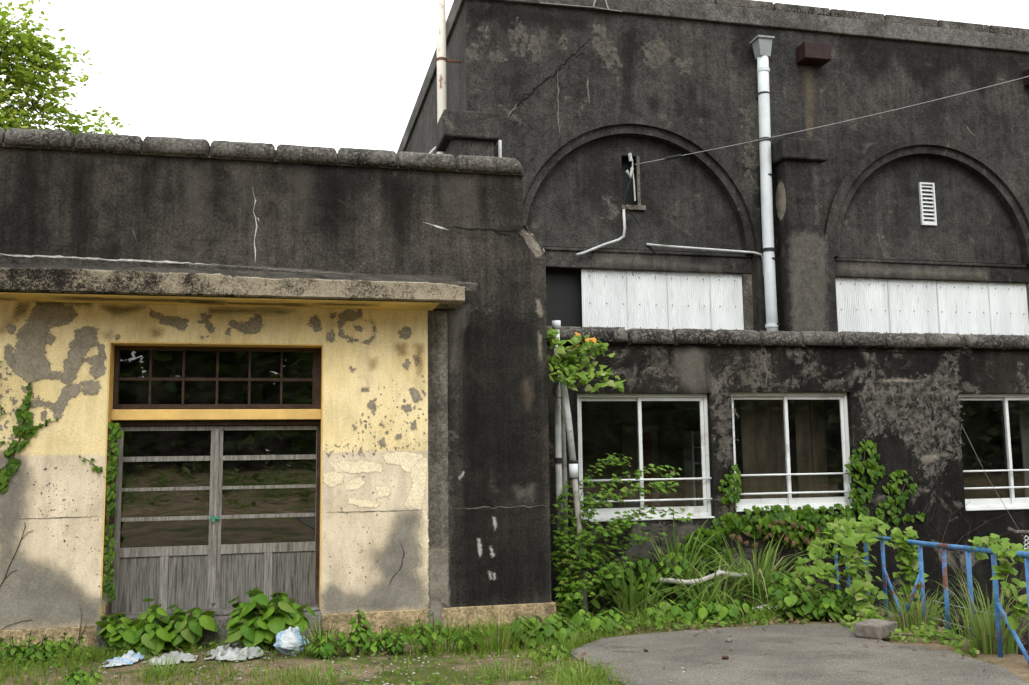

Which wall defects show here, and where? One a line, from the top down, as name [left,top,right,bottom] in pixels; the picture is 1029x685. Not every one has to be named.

crack [506,40,590,133]
crack [251,192,259,260]
peeling [149,308,263,339]
peeling [306,309,376,345]
peeling [398,327,413,341]
peeling [0,302,121,444]
peeling [323,351,430,606]